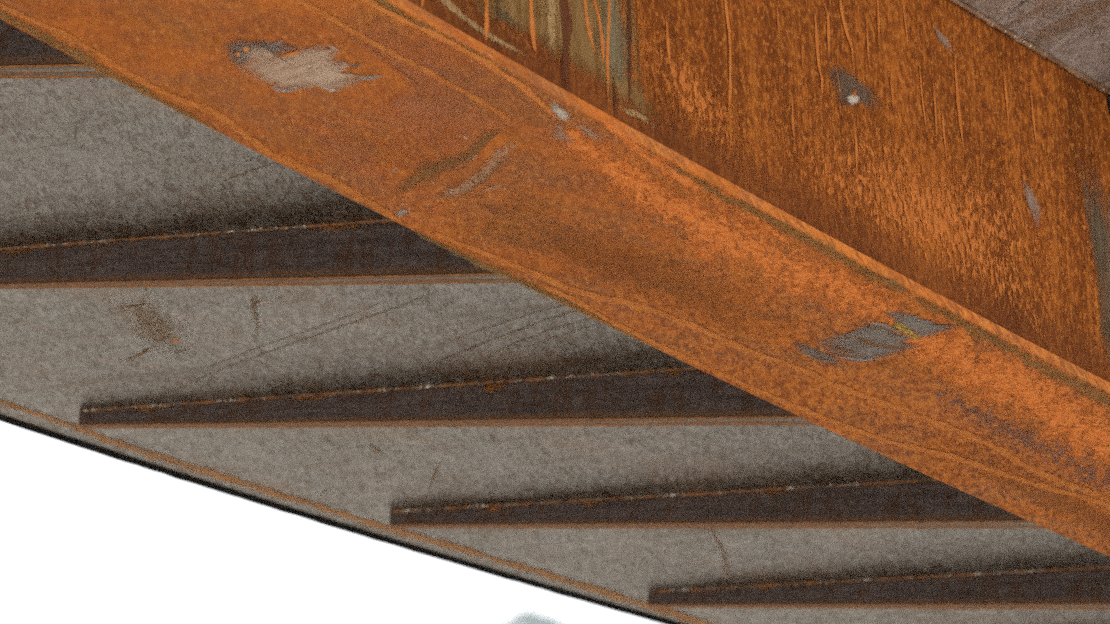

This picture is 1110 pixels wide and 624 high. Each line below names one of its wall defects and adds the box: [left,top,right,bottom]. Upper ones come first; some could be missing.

corrosion [0,3,401,223]
peeling [230,42,376,92]
corrosion [297,0,556,122]
corrosion [560,0,610,99]
corrosion [646,0,744,158]
corrosion [565,122,902,324]
peeling [670,166,904,290]
corrosion [762,71,1064,331]
peeling [1025,187,1039,220]
corrosion [432,232,1110,507]
peeling [797,299,1110,404]
corrosion [0,400,712,624]